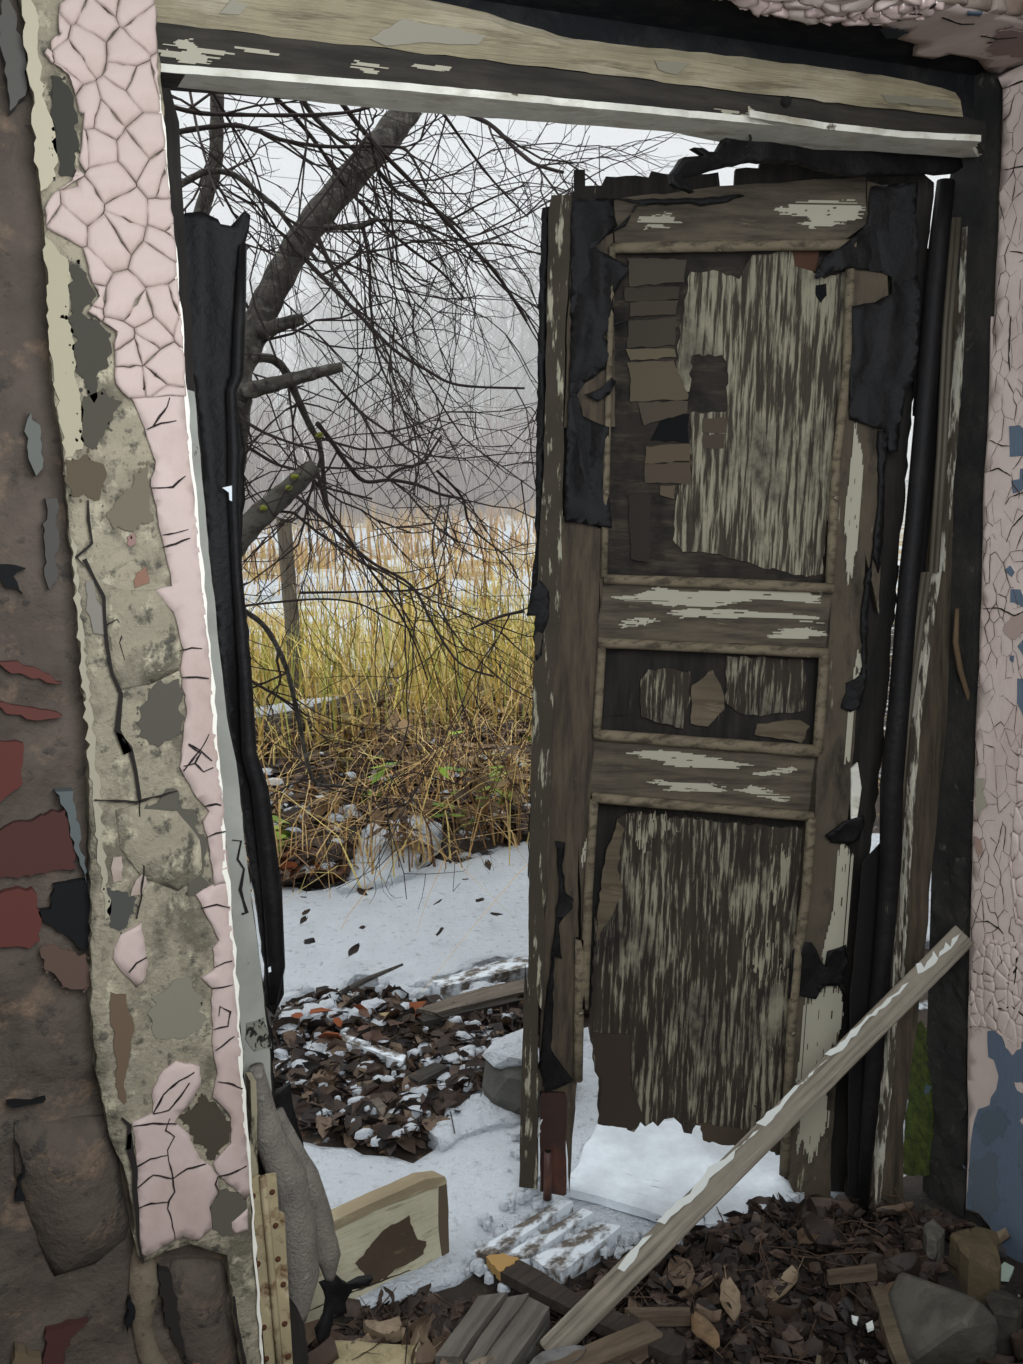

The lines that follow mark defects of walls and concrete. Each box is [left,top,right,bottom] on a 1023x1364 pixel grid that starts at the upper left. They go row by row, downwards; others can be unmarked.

peeling [719,0,945,26]
crack [143,373,177,430]
crack [152,476,185,489]
peeling [1009,425,1023,493]
spalling [0,564,26,592]
crack [968,80,1023,1030]
peeling [42,0,250,1364]
crack [75,500,249,919]
flaking render [0,808,90,951]
crack [121,960,247,1262]
peeling [966,939,1023,1282]
crack [124,1294,136,1333]